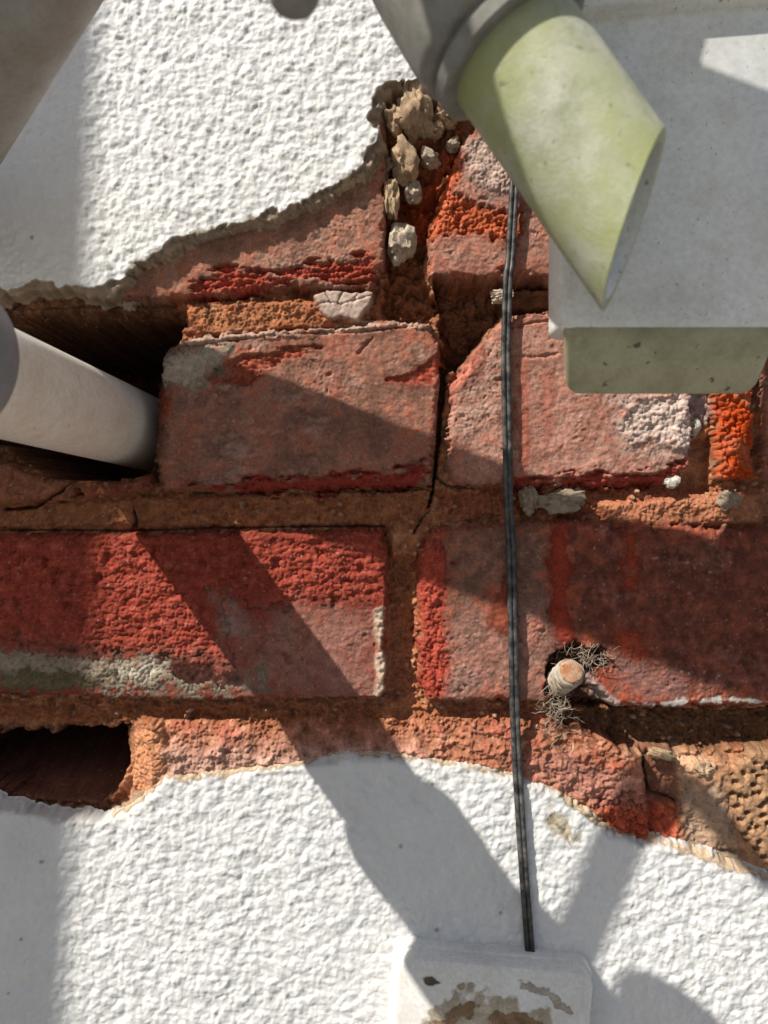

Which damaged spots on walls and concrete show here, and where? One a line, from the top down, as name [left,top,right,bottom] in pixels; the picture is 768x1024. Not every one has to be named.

spalling [424,131,523,244]
spalling [8,157,393,399]
spalling [366,278,549,401]
crack [193,489,292,497]
crack [322,368,475,530]
spalling [514,461,689,493]
damp [615,394,692,454]
spalling [706,389,761,482]
spalling [0,526,389,668]
damp [0,649,267,700]
spalling [0,718,339,817]
spalling [545,745,768,880]